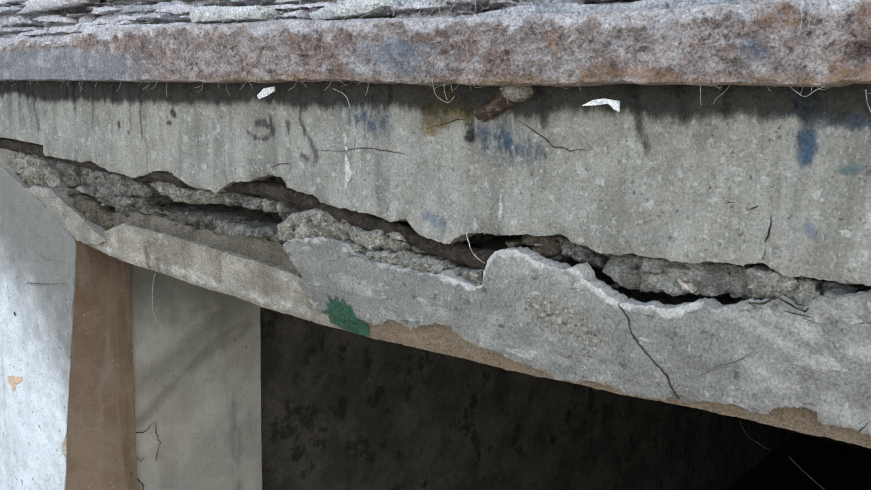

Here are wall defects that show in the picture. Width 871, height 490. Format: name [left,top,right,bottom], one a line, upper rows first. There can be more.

leakage [0,80,502,132]
peeling [257,87,275,99]
rust [0,0,871,134]
peeling [582,98,620,112]
leakage [496,83,871,152]
spalling [0,138,869,306]
peeling [242,291,308,313]
crack [618,304,679,399]